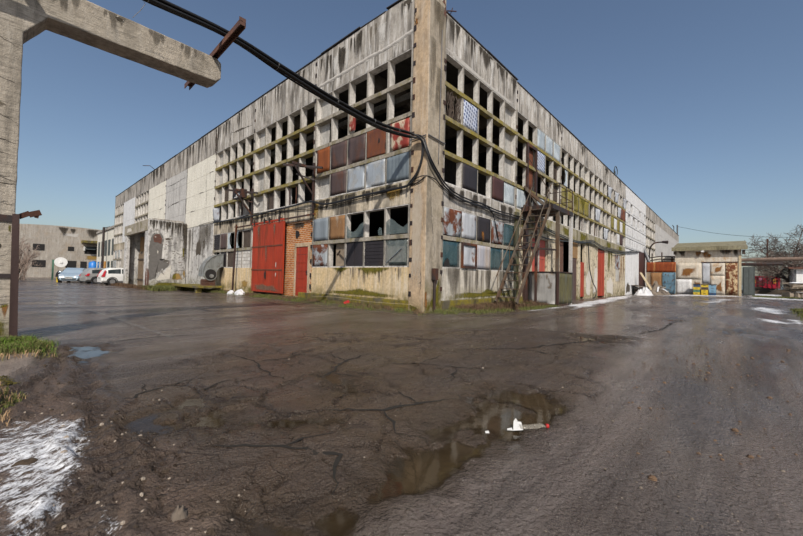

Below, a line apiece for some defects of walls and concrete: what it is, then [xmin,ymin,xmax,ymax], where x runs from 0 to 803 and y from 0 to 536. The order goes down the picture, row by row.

leakage [321,22,385,74]
leakage [433,43,442,102]
leakage [435,2,585,153]
spalling [147,232,205,285]